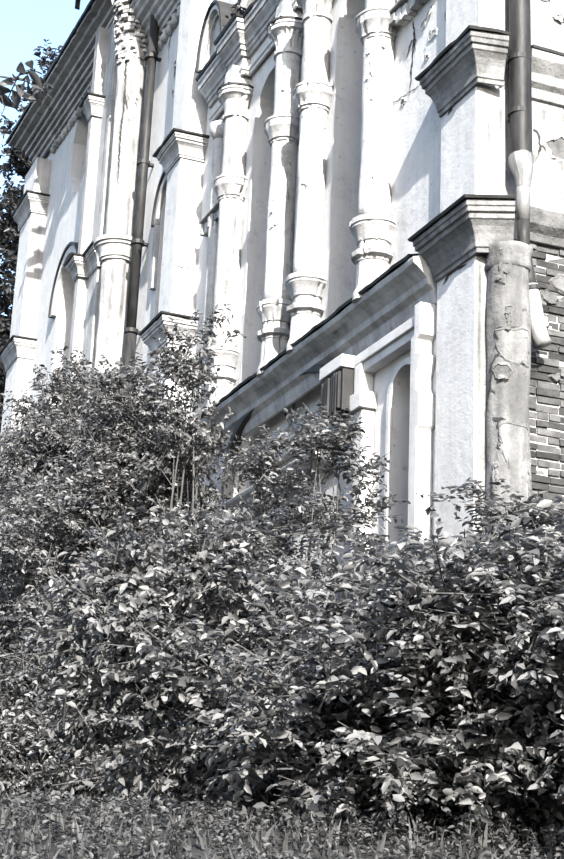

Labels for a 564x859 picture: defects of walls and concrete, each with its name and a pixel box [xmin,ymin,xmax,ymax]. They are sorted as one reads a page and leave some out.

flaking render [541,133,564,166]
flaking render [495,247,513,285]
flaking render [492,304,530,380]
flaking render [491,417,531,540]